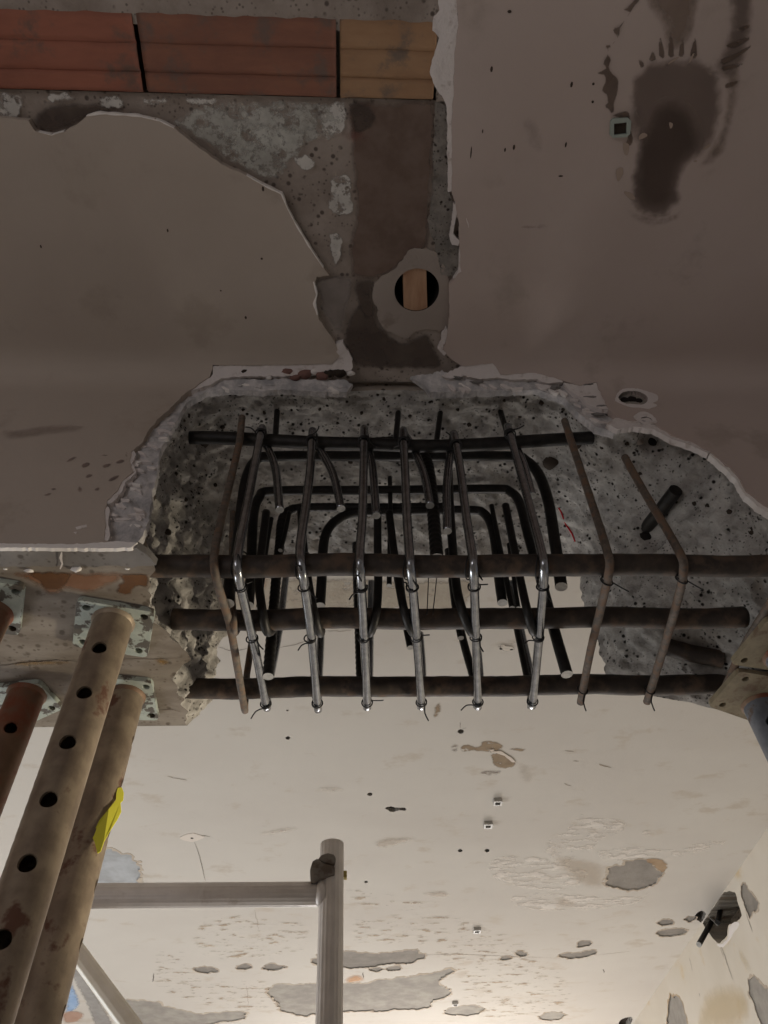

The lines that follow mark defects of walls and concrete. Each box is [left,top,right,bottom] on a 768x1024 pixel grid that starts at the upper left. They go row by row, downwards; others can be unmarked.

damp [599,0,750,212]
flaking render [0,0,768,555]
spalling [223,578,281,609]
spalling [262,631,277,680]
spalling [354,629,362,676]
spalling [456,629,473,676]
spalling [500,629,530,675]
spalling [548,629,573,678]
spalling [98,847,144,883]
spalling [602,858,667,893]
spalling [235,963,316,1018]
spalling [343,948,486,1016]